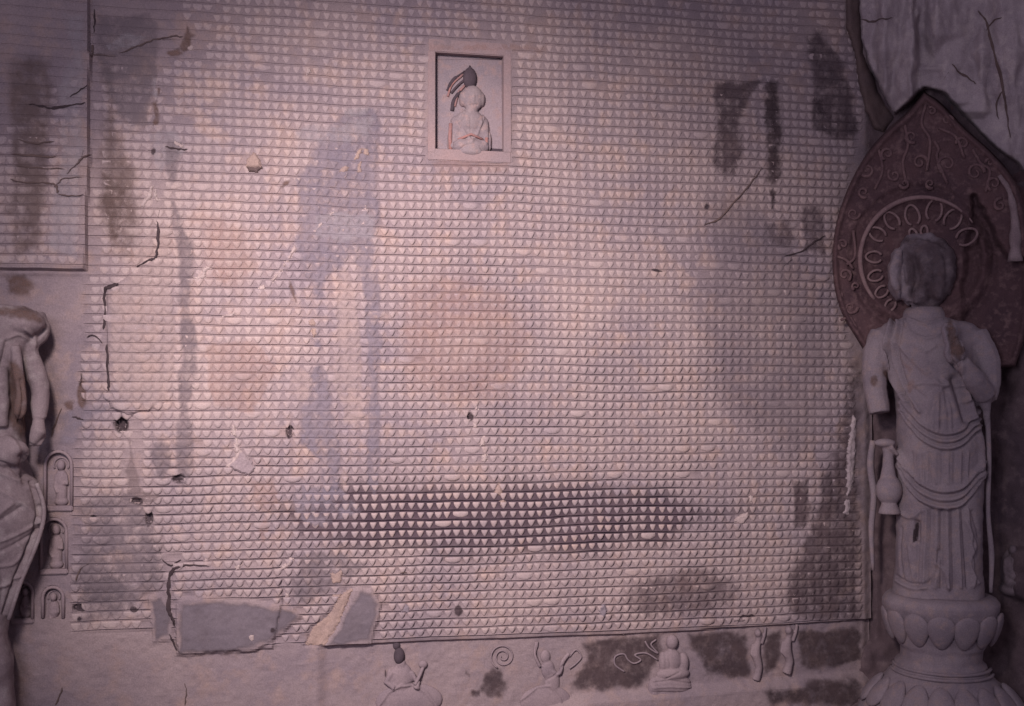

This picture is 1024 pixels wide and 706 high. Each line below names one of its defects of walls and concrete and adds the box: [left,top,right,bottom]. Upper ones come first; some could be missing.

crack [90,10,182,58]
crack [29,85,87,110]
crack [945,11,1011,138]
crack [11,139,91,197]
crack [705,168,762,225]
crack [87,197,160,392]
leakage [297,109,382,485]
crack [159,549,208,651]
spalling [305,570,353,646]